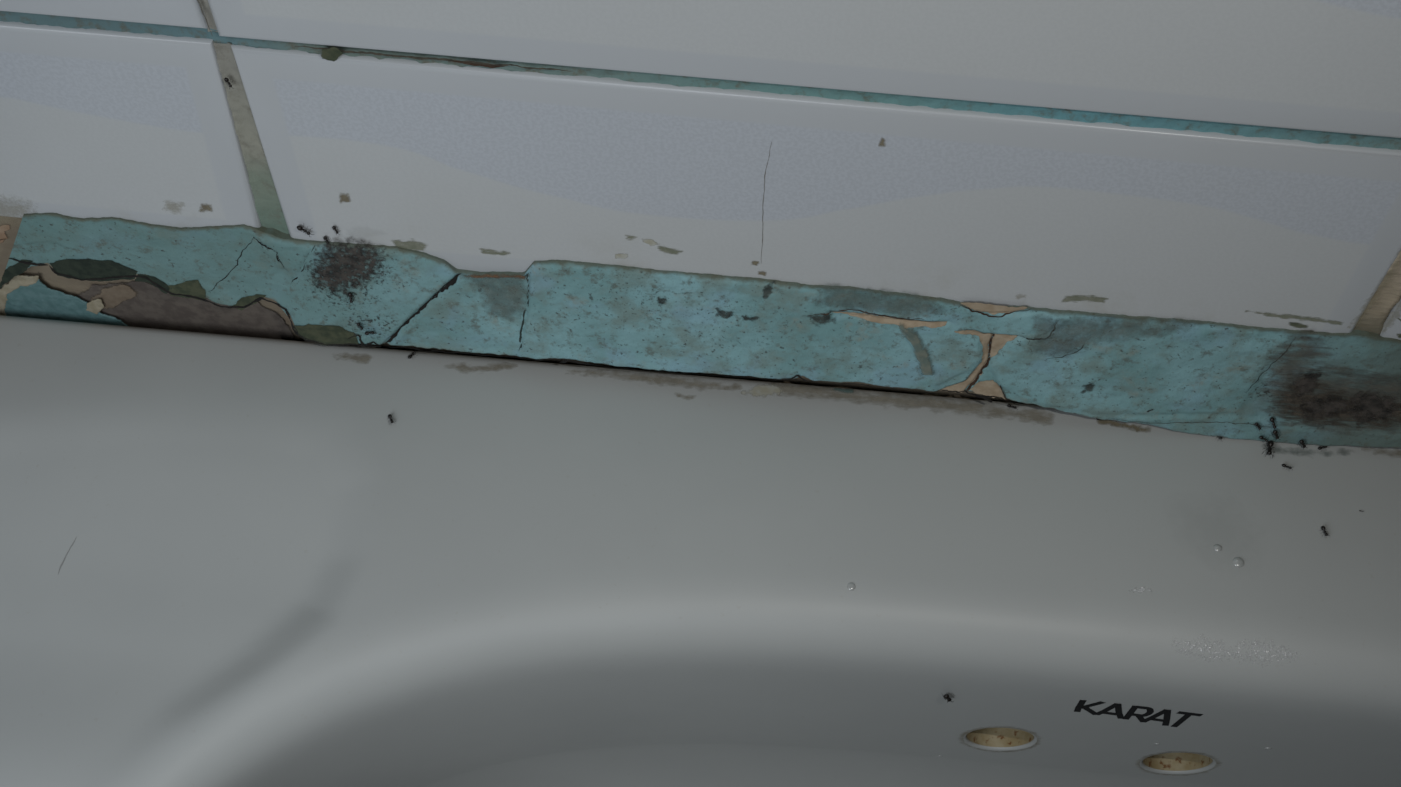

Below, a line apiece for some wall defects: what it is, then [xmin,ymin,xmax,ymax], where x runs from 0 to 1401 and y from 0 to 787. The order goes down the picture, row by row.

spalling [0,259,381,347]
leakage [307,239,394,336]
crack [385,274,1085,405]
peeling [811,302,1028,400]